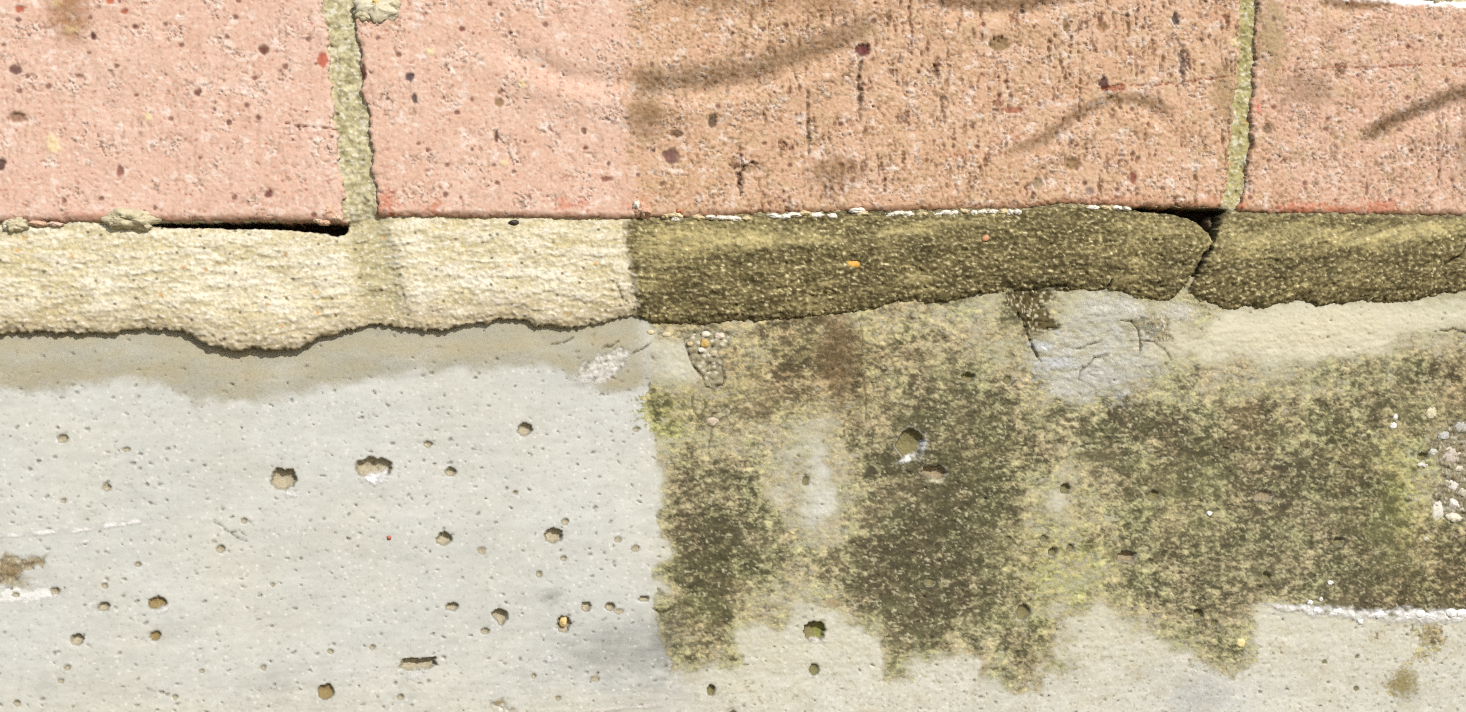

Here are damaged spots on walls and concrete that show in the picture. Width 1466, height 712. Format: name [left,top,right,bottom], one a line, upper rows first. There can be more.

crack [1191,246,1210,277]
leakage [851,546,1063,694]
leakage [1147,580,1466,698]